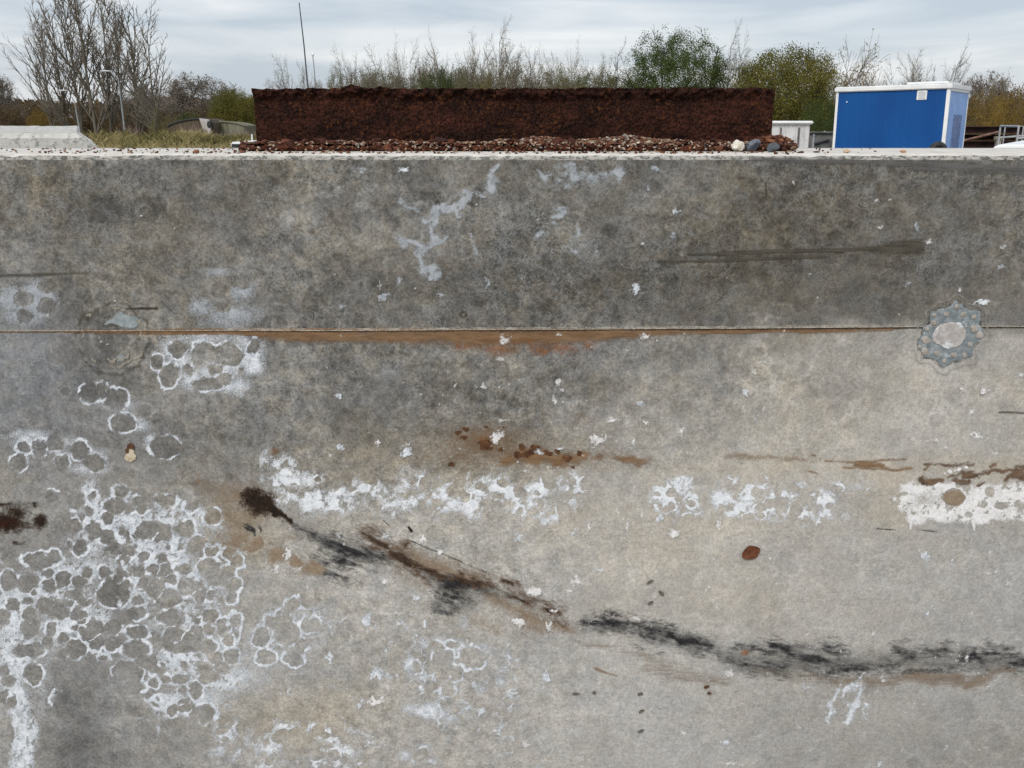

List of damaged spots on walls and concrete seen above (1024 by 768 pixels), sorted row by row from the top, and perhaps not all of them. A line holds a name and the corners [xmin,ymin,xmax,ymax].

damp [539,162,625,188]
damp [395,164,499,281]
rust [1,328,897,352]
damp [77,286,264,460]
damp [259,449,587,526]
rust [467,434,601,467]
rust [615,456,646,467]
damp [649,475,870,531]
rust [846,459,1024,487]
damp [0,430,386,768]
damp [385,619,521,753]
damp [825,671,869,725]